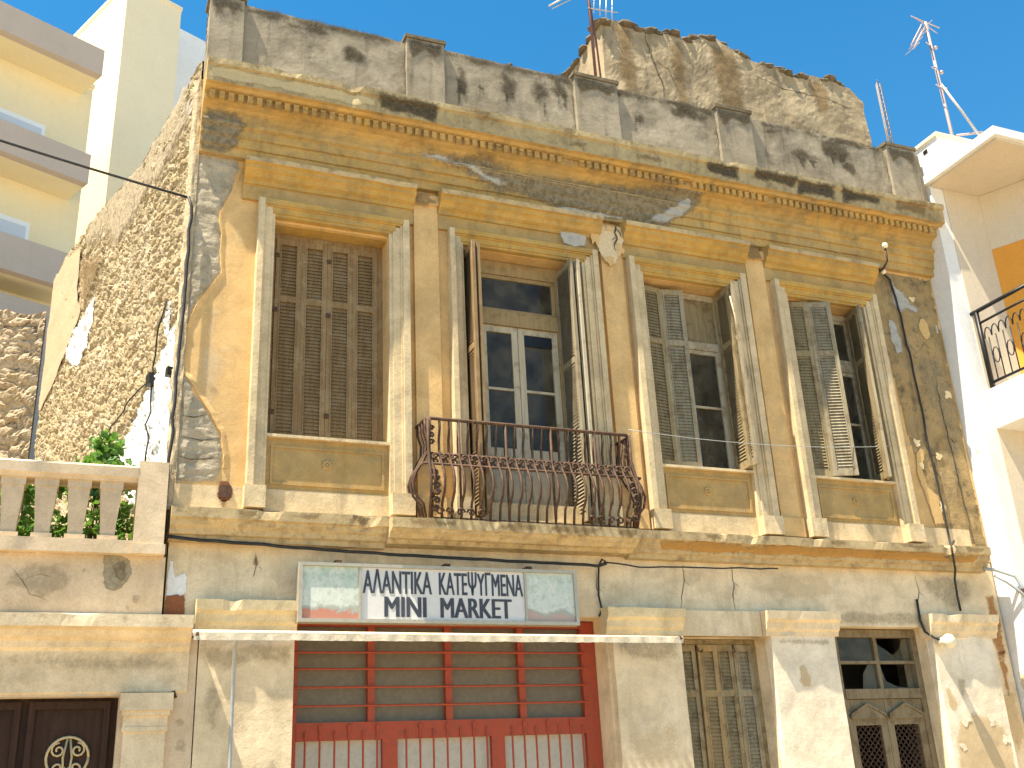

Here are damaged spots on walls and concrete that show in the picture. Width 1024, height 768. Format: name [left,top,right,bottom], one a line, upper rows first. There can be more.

damp [410,25,750,124]
crack [644,32,679,99]
damp [201,108,246,152]
damp [426,154,704,226]
mould [707,162,739,178]
mould [756,122,914,203]
flaking render [39,86,188,410]
peeling [590,225,625,266]
spalling [118,154,243,483]
spalling [874,273,986,546]
peeling [164,561,187,615]